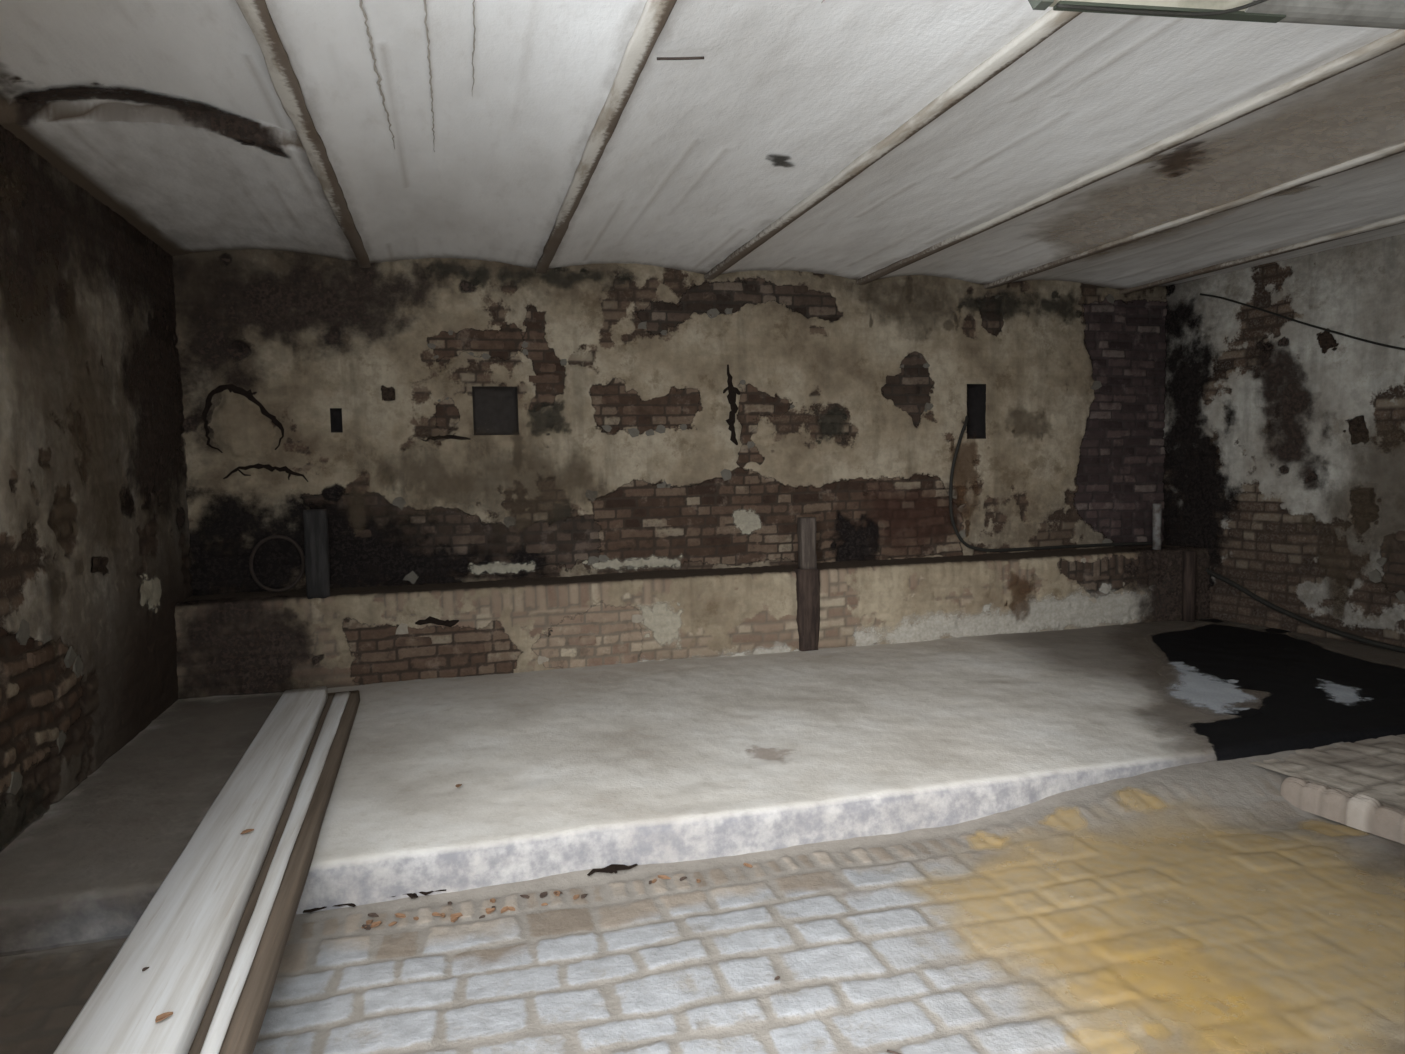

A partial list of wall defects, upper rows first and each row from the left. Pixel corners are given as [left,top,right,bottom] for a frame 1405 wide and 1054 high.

crack [359,0,395,149]
crack [423,0,435,152]
crack [202,384,308,482]
water stain [0,72,634,539]
spalling [427,305,567,411]
flaking render [301,378,969,576]
crack [723,365,740,445]
spalling [635,276,843,335]
flaking render [1057,294,1168,604]
water stain [1252,337,1328,489]
water stain [854,583,1405,761]
water stain [926,809,1405,1054]